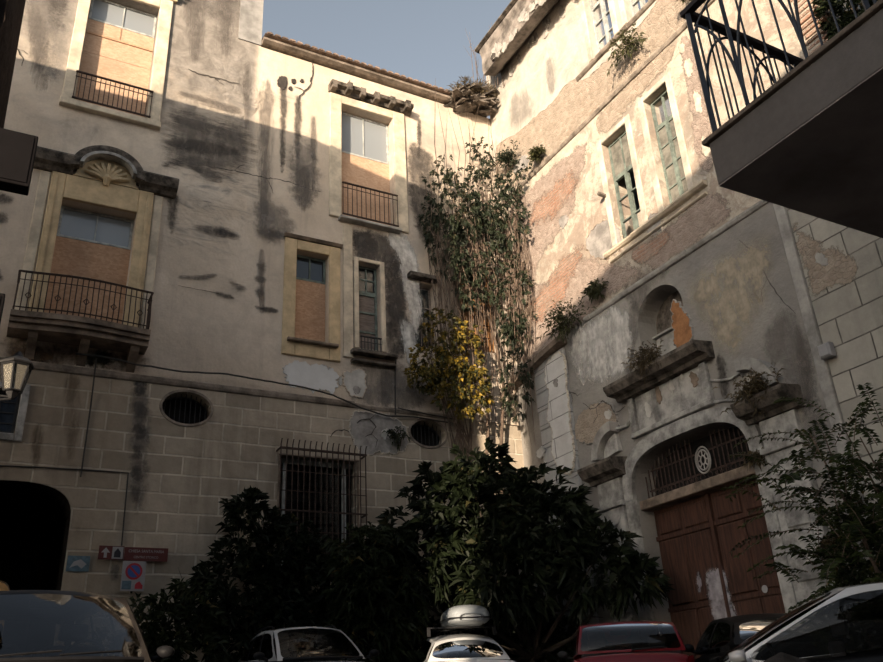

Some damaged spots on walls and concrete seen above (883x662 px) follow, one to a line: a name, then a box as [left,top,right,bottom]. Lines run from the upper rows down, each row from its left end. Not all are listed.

leakage [29,0,64,71]
leakage [186,0,241,60]
leakage [164,67,317,241]
flaking render [490,0,713,364]
leakage [354,232,378,255]
leakage [256,250,278,313]
leakage [363,232,426,408]
leakage [132,381,149,503]
flaking render [338,367,367,399]
flaking render [349,410,409,456]
peeling [536,351,619,476]
peeling [644,371,699,417]